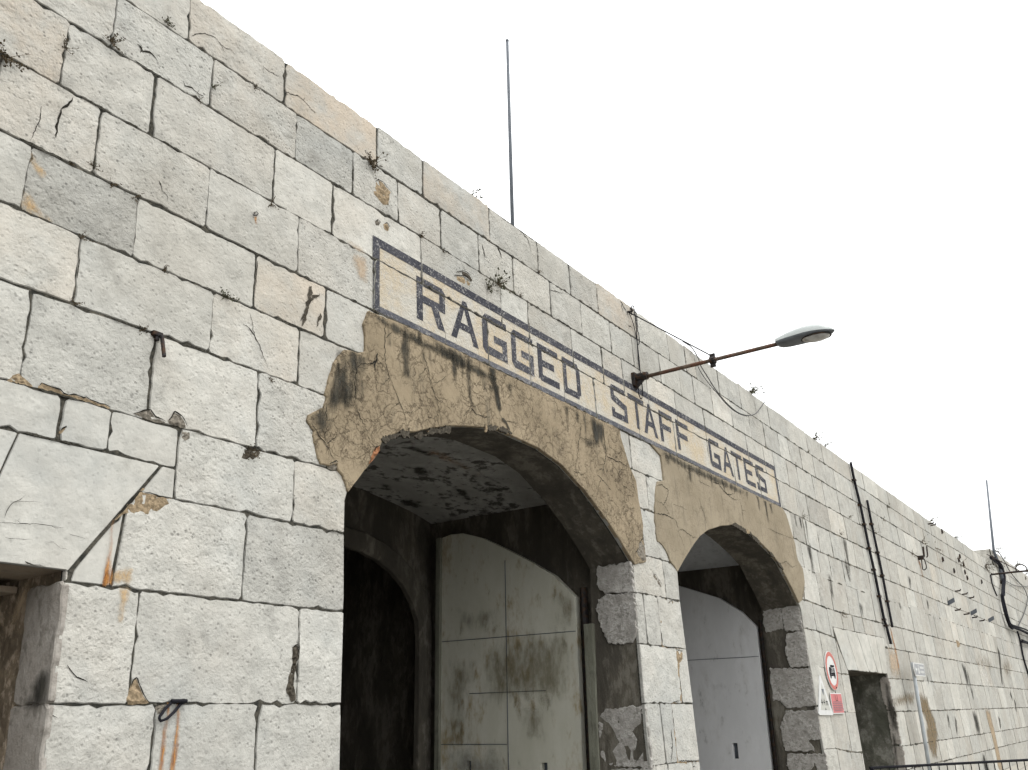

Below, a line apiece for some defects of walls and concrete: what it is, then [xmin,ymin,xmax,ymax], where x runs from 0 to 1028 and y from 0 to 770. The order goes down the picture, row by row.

crack [32,98,73,137]
crack [301,286,322,327]
damp [378,318,510,410]
crack [312,323,514,457]
spalling [369,425,452,465]
spalling [115,488,171,520]
rust [103,555,130,599]
rust [159,724,178,770]